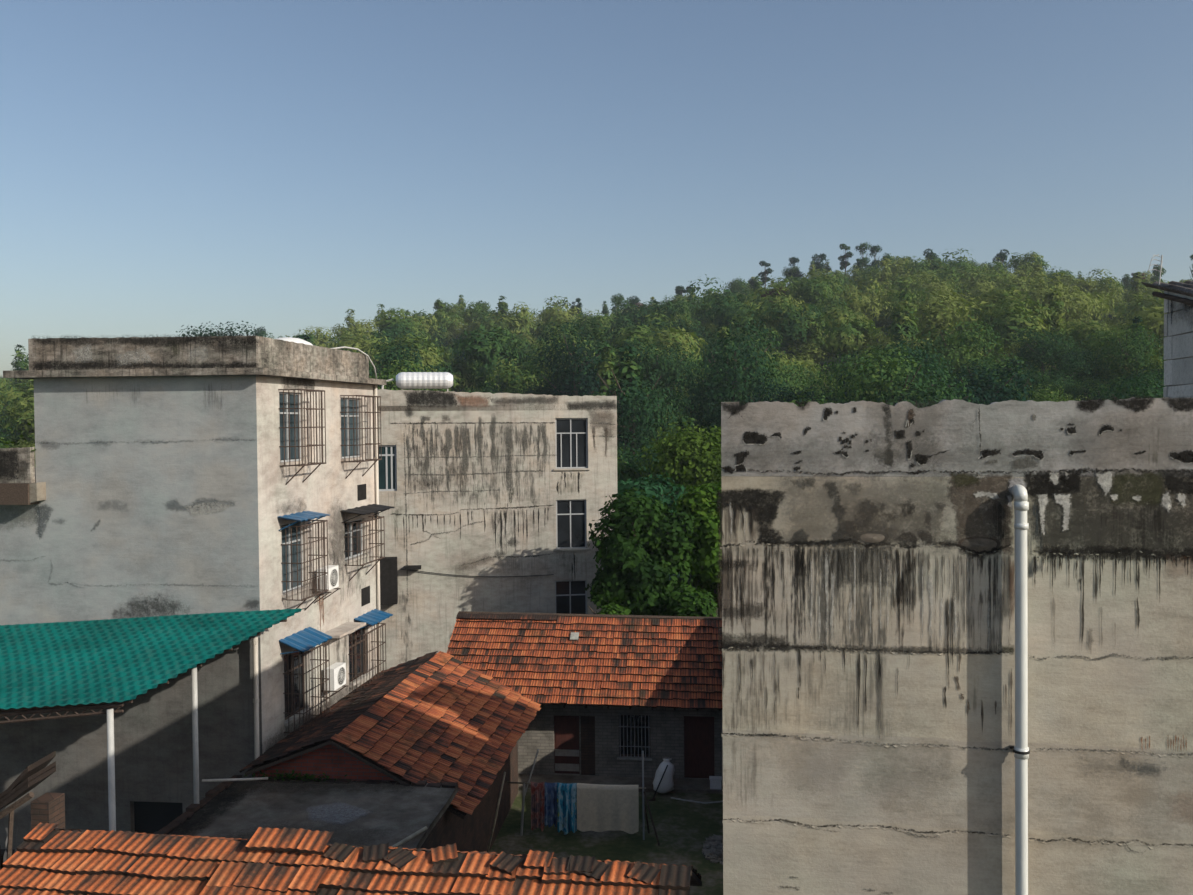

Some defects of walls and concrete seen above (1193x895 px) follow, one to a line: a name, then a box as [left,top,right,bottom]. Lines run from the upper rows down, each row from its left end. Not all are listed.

leakage [403,390,615,550]
spalling [722,431,782,473]
spalling [835,432,872,458]
spalling [894,409,949,467]
flaking render [1096,470,1119,500]
spalling [1170,450,1193,464]
flaking render [1161,492,1186,512]
crack [720,538,1193,559]
leakage [717,470,1193,731]
crack [722,642,1193,660]
crack [721,733,1193,758]
crack [723,818,1193,853]